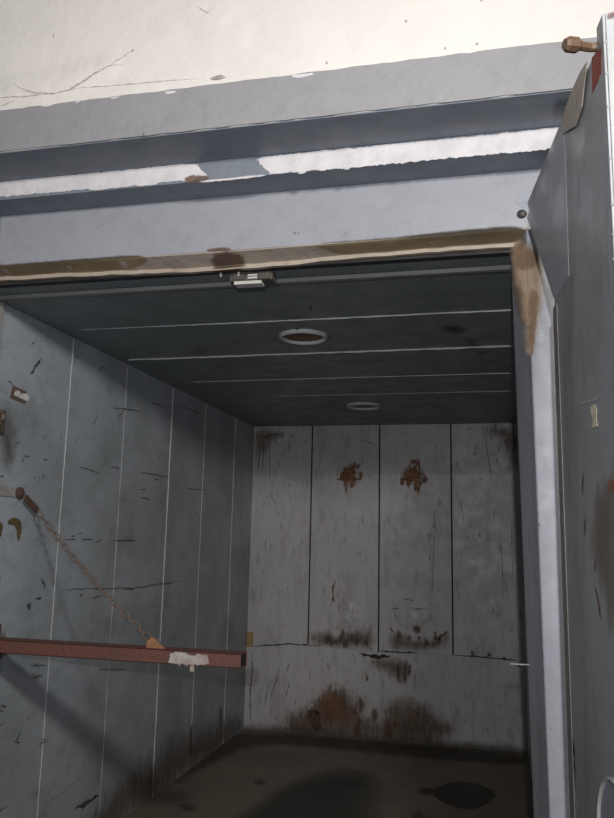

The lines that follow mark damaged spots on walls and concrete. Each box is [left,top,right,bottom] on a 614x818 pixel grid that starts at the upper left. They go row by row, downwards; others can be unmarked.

crack [0,50,199,106]
peeling [0,128,558,197]
corrosion [337,463,363,492]
corrosion [400,460,429,496]
corrosion [313,630,370,647]
corrosion [390,626,448,648]
corrosion [291,690,450,742]